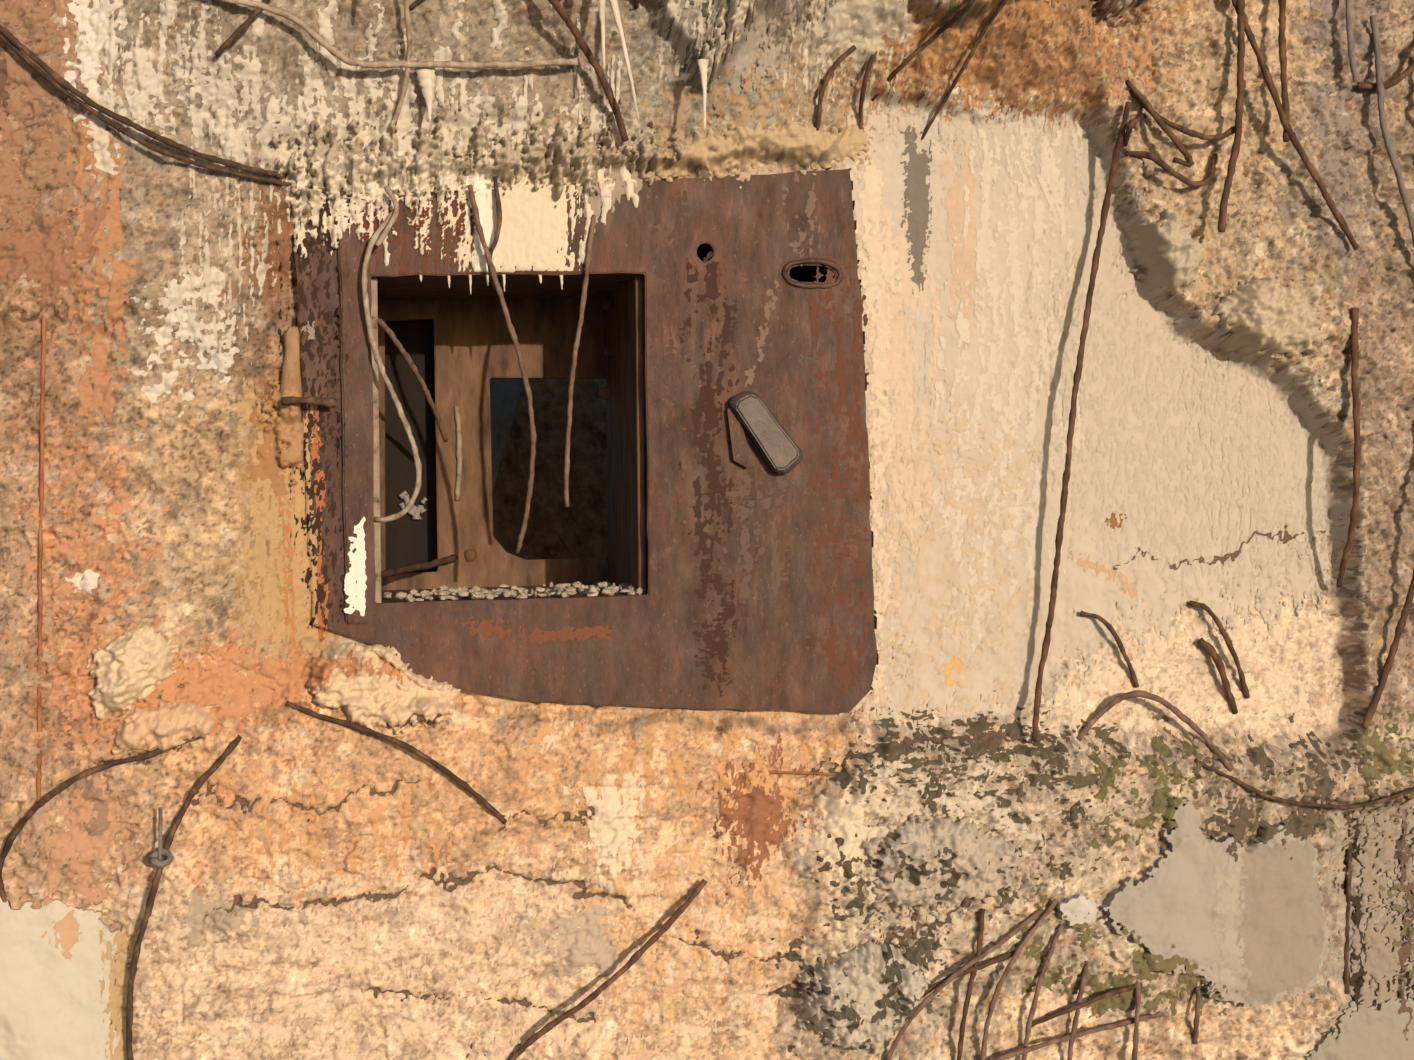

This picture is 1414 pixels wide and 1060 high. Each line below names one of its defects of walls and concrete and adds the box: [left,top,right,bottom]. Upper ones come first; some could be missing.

peeling [684,0,804,115]
rust [0,0,139,439]
peeling [810,0,1414,1060]
crack [1113,525,1343,570]
rust [454,617,613,644]
rust [479,250,865,1047]
damp [180,891,264,952]
crack [203,866,634,922]
crack [662,929,807,965]
damp [784,748,1065,938]
damp [1203,834,1325,1005]
crack [367,987,596,1023]